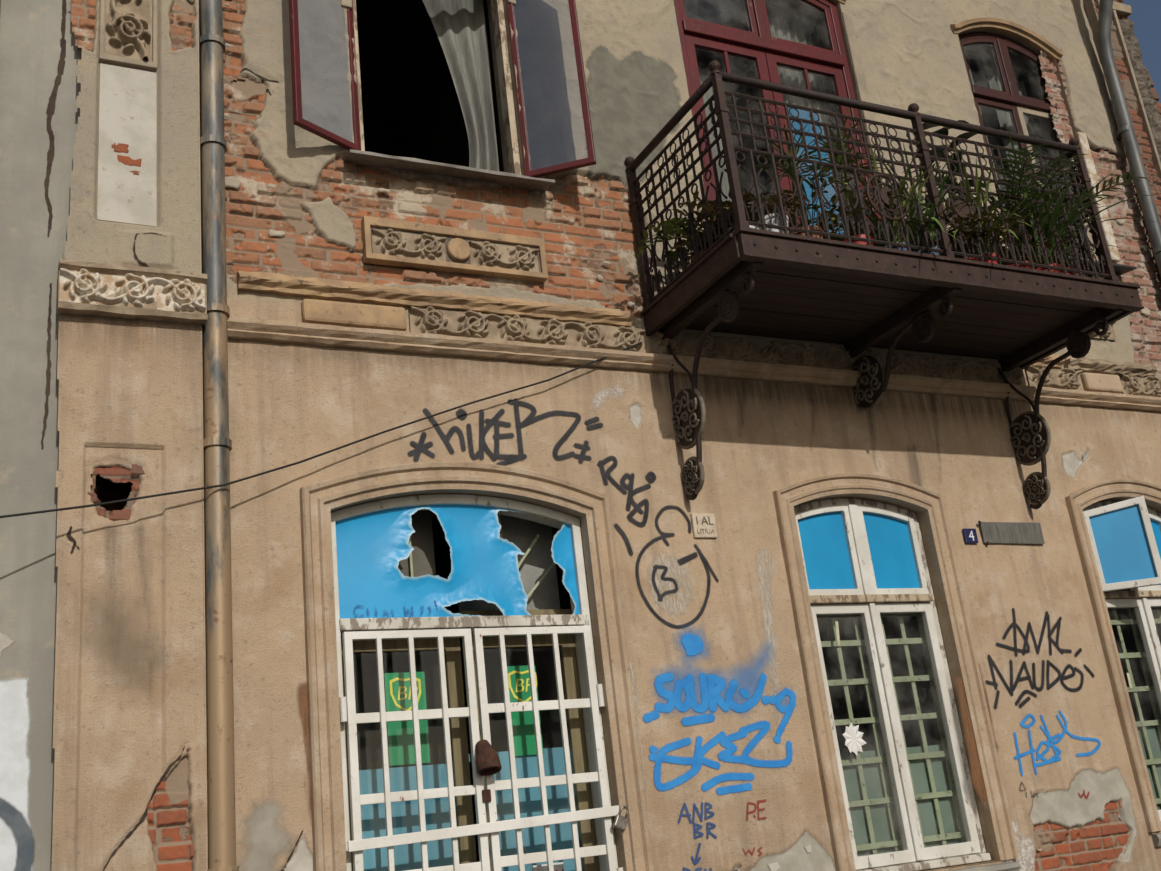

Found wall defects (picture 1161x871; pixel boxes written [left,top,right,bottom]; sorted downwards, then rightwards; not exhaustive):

crack [44,0,67,237]
flaking render [112,143,142,175]
flaking render [222,0,646,318]
flaking render [1038,50,1077,144]
flaking render [1094,0,1161,224]
flaking render [1089,147,1161,371]
crack [41,283,52,449]
spalling [87,464,145,521]
crack [103,746,185,871]
flaking render [147,756,194,871]
peeling [733,831,836,871]
flaking render [1030,768,1137,871]